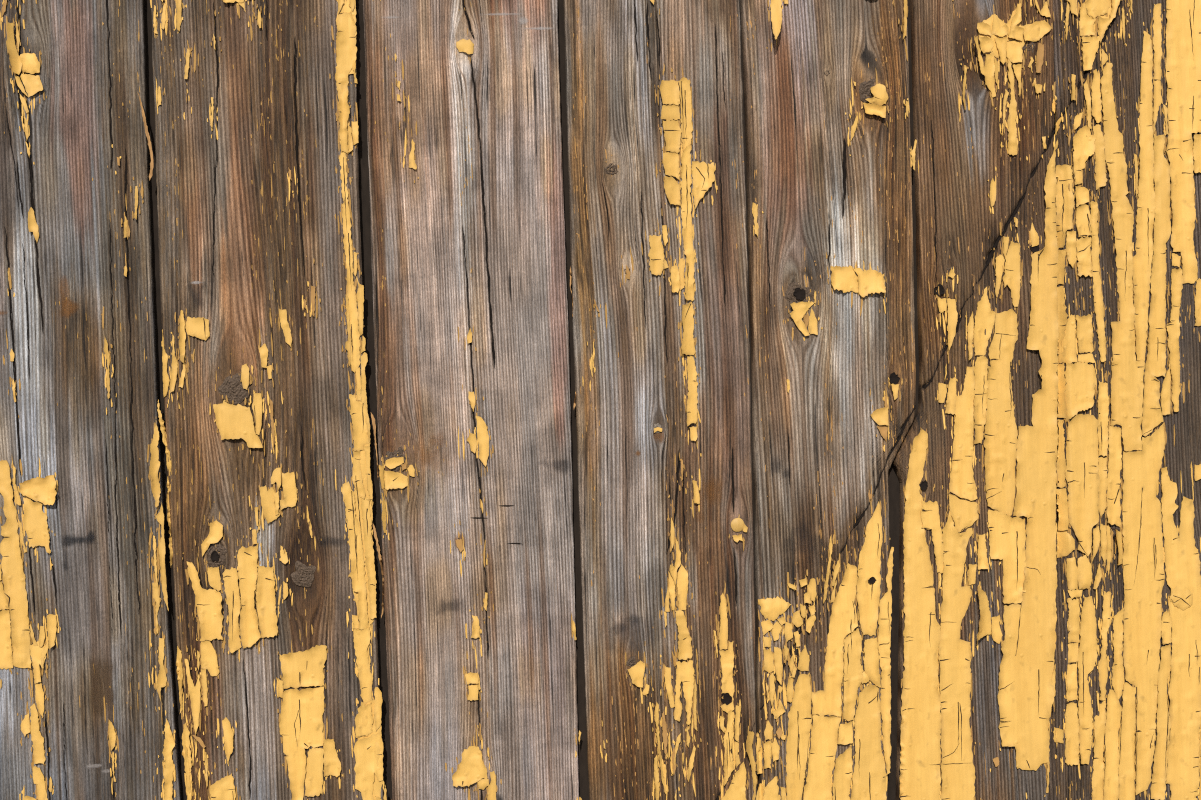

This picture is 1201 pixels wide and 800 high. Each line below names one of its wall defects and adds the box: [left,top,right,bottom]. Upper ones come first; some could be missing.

peeling [0,0,47,165]
crack [715,26,726,306]
peeling [0,459,61,800]
peeling [147,0,419,800]
peeling [445,723,502,800]
crack [460,0,495,657]
peeling [582,342,596,391]
crack [729,450,737,512]
crack [731,551,739,604]
peeling [622,0,1201,800]
crack [740,0,1121,752]